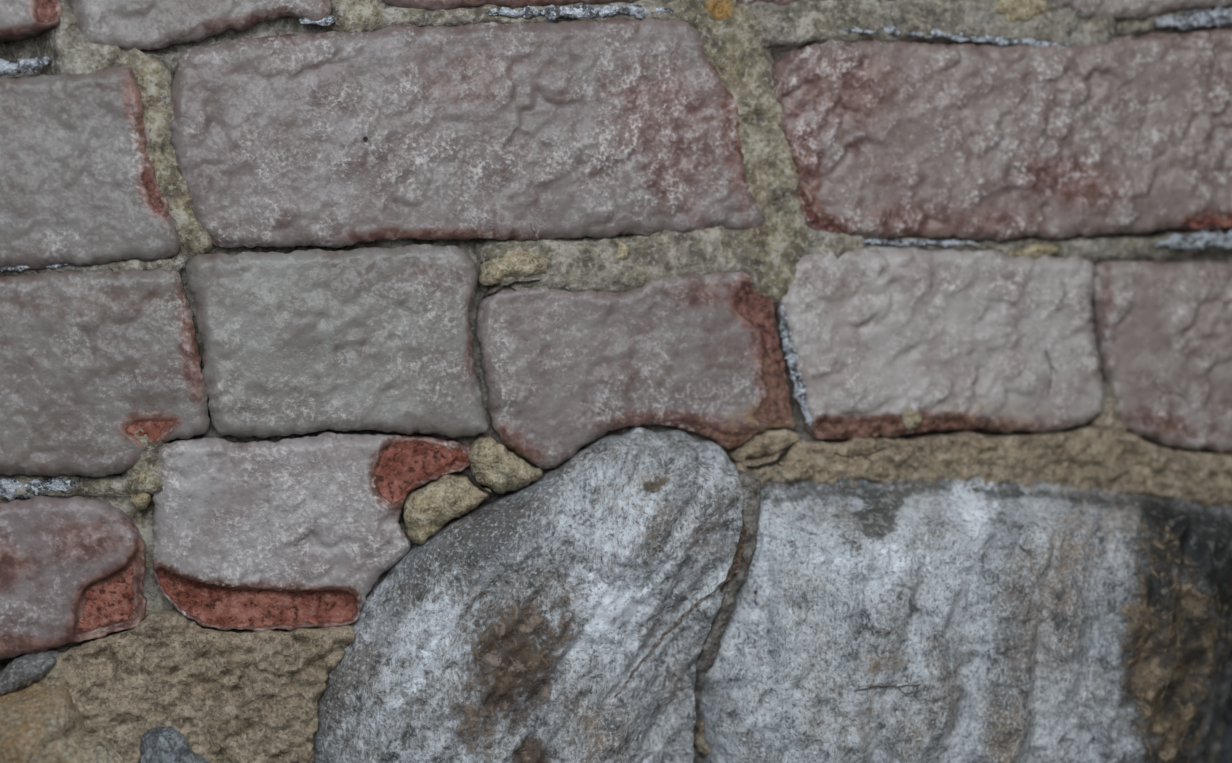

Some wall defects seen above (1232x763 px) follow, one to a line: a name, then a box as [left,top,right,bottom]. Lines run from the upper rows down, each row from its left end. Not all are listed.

crack [614,525,758,698]